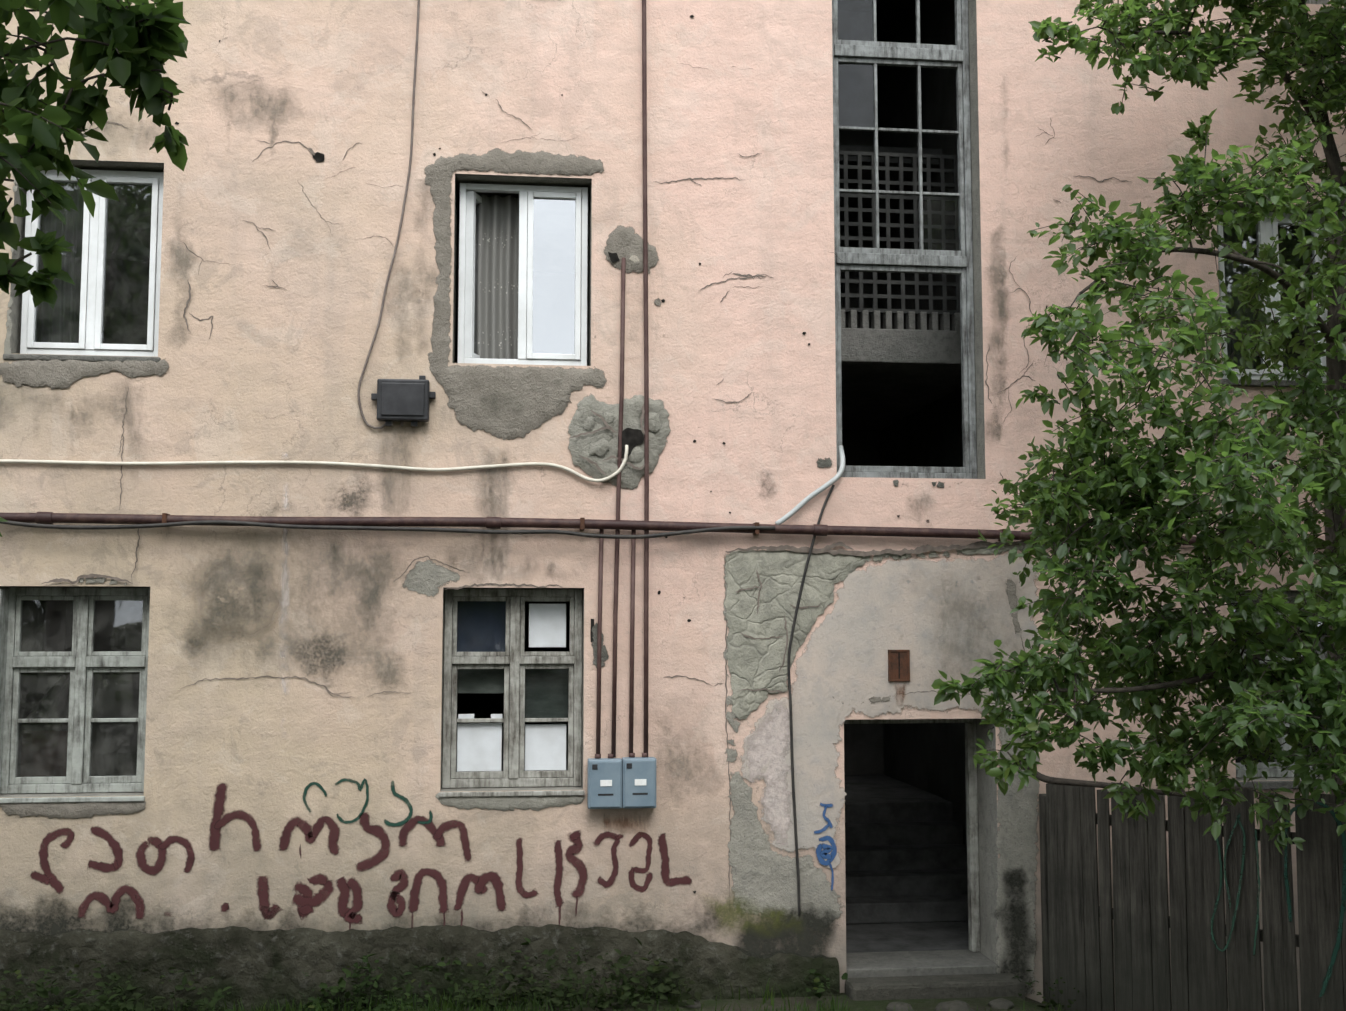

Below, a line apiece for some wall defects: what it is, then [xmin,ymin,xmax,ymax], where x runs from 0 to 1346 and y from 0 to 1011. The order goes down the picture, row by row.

crack [252,140,308,162]
crack [654,153,759,185]
crack [298,143,401,246]
crack [183,242,229,339]
crack [701,273,773,302]
peeling [402,559,460,597]
damp [301,636,345,673]
crack [178,675,404,698]
peeling [723,544,1045,995]
damp [996,869,1035,996]